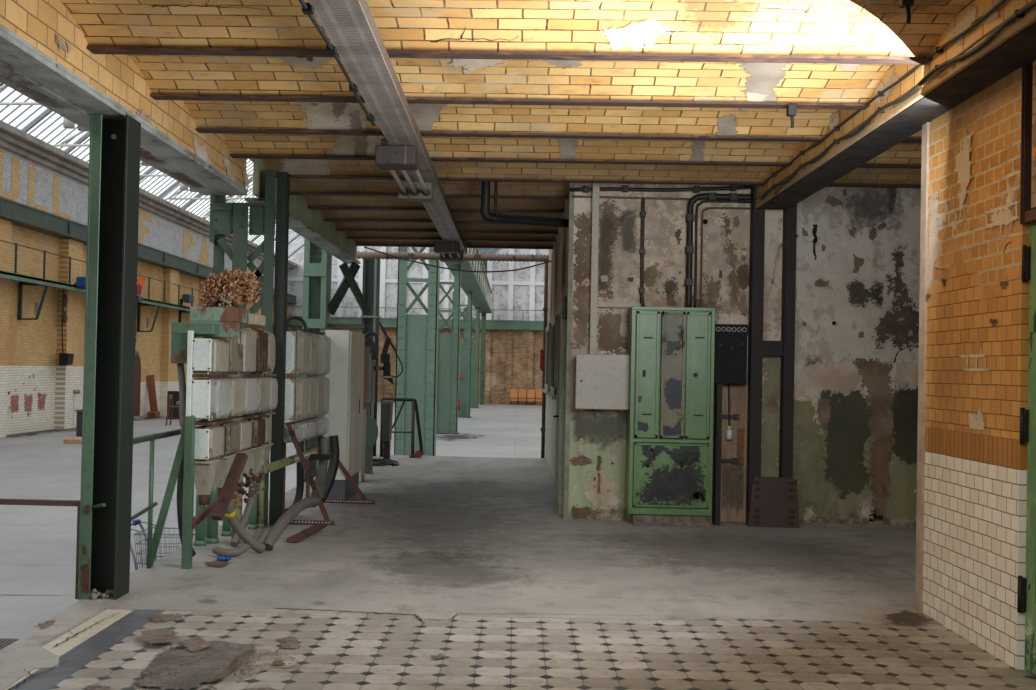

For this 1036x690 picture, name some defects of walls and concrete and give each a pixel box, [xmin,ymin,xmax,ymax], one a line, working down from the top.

flaking render [601,18,672,52]
flaking render [734,62,791,102]
flaking render [837,64,861,72]
flaking render [868,221,887,240]
flaking render [571,183,749,355]
flaking render [794,246,930,527]